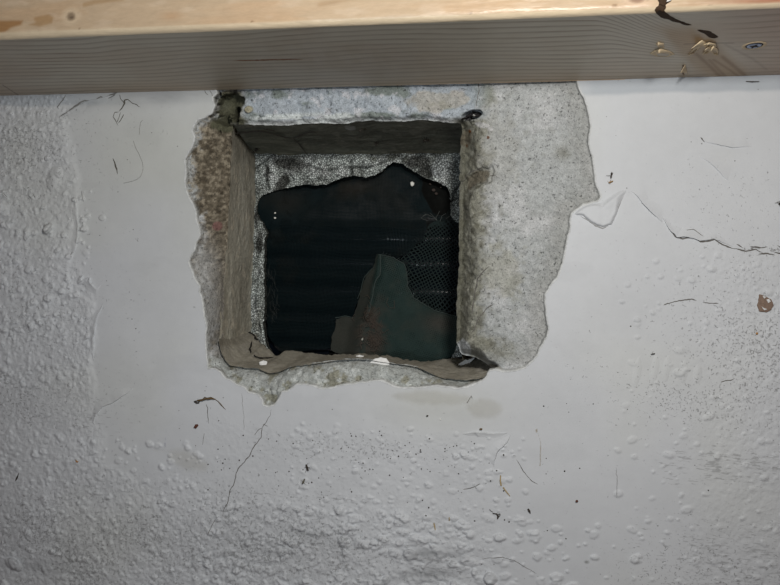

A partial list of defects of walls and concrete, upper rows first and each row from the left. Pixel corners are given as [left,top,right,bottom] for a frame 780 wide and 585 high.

spalling [184,81,626,408]
crack [662,218,780,255]
crack [208,398,271,534]